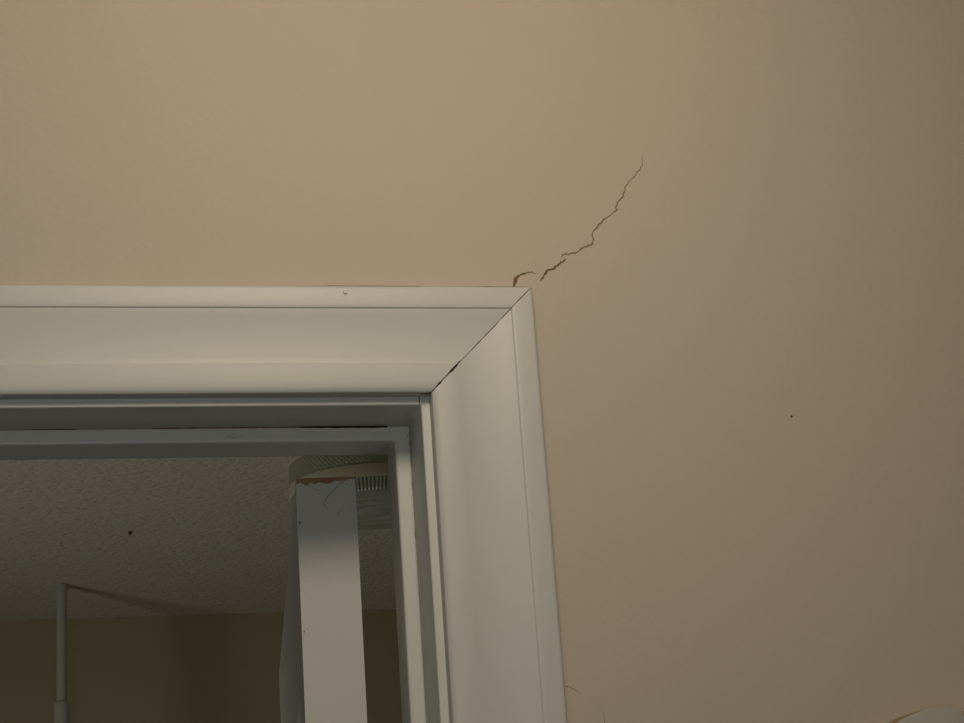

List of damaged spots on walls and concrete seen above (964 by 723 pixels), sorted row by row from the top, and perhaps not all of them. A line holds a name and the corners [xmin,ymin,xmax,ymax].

crack [418,156,643,405]